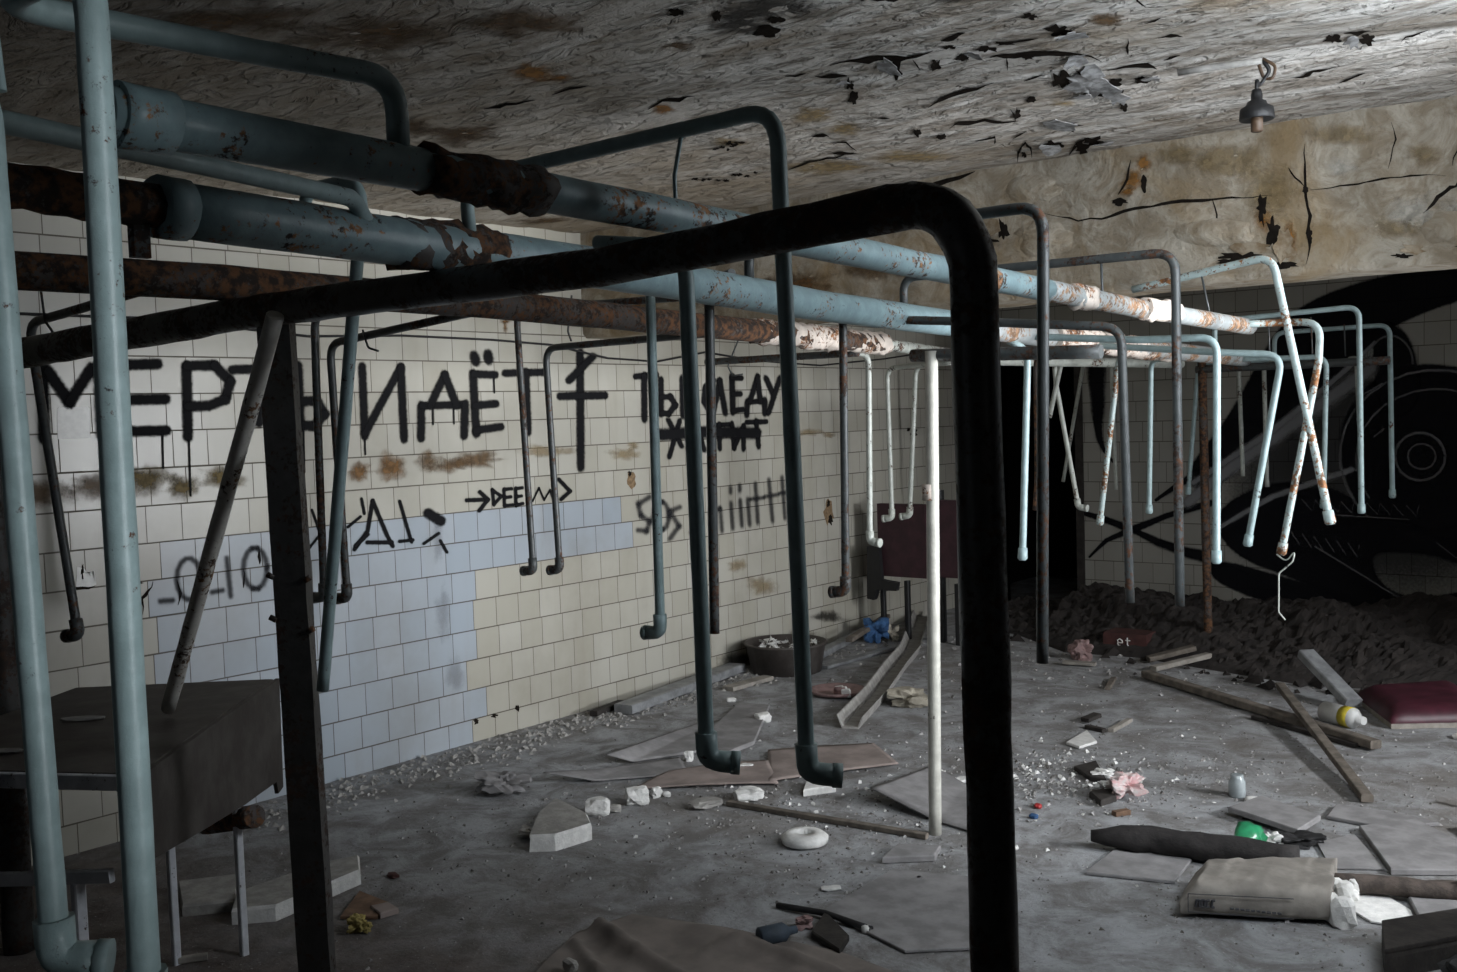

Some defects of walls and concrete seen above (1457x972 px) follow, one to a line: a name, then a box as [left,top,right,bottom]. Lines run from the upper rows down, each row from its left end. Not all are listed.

peeling [752,16,786,38]
peeling [1322,31,1376,50]
peeling [785,13,1182,112]
peeling [649,96,695,109]
peeling [812,133,859,160]
peeling [975,119,1114,163]
crack [1048,123,1457,263]
corrosion [350,457,403,480]
corrosion [421,451,492,472]